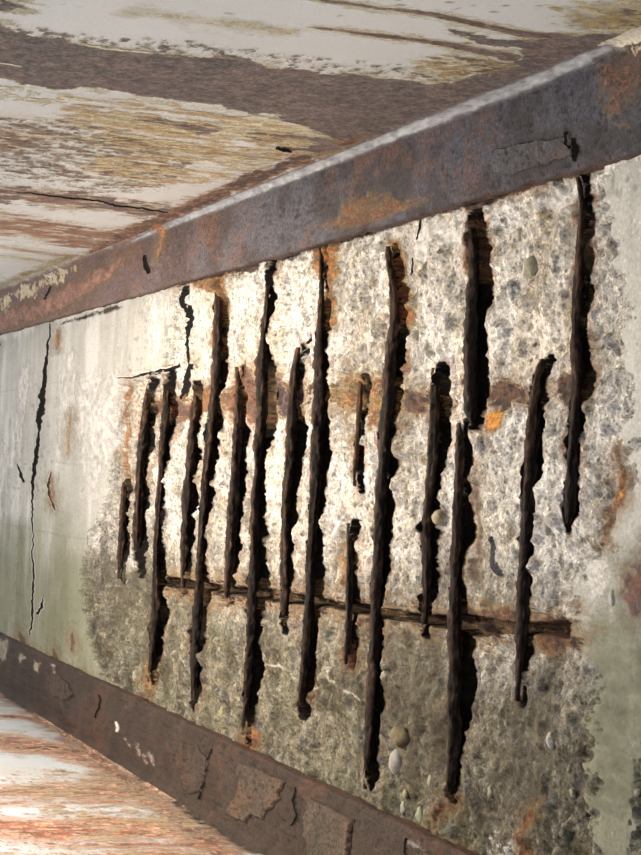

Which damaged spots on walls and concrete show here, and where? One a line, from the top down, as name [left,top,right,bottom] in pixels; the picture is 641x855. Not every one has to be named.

peeling [0,0,35,14]
corrosion [317,0,641,39]
corrosion [8,26,522,83]
peeling [0,23,617,154]
crack [17,192,168,213]
corrosion [0,94,361,284]
corrosion [154,360,313,425]
leakage [55,351,124,503]
crack [16,323,57,636]
spalling [78,168,641,855]
leakage [577,552,608,598]
leakage [0,639,9,660]